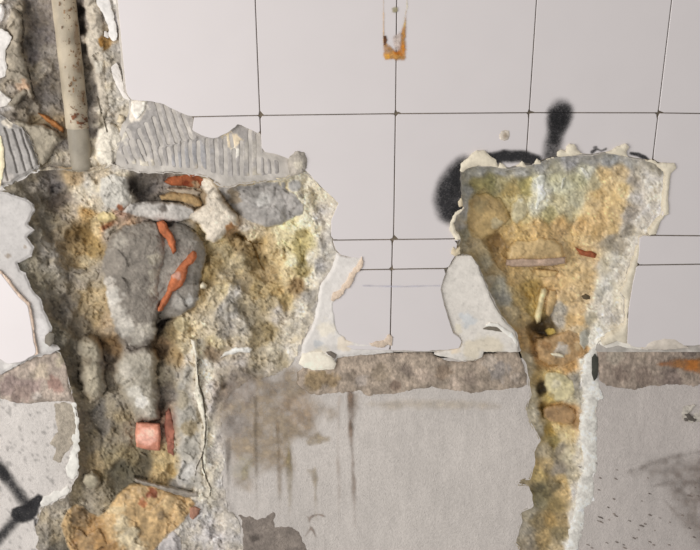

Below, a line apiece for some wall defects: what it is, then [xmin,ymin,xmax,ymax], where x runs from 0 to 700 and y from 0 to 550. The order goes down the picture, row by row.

rust [383,20,406,60]
spalling [0,0,338,550]
spalling [296,144,700,550]
crack [195,358,211,495]
water stain [220,371,327,480]